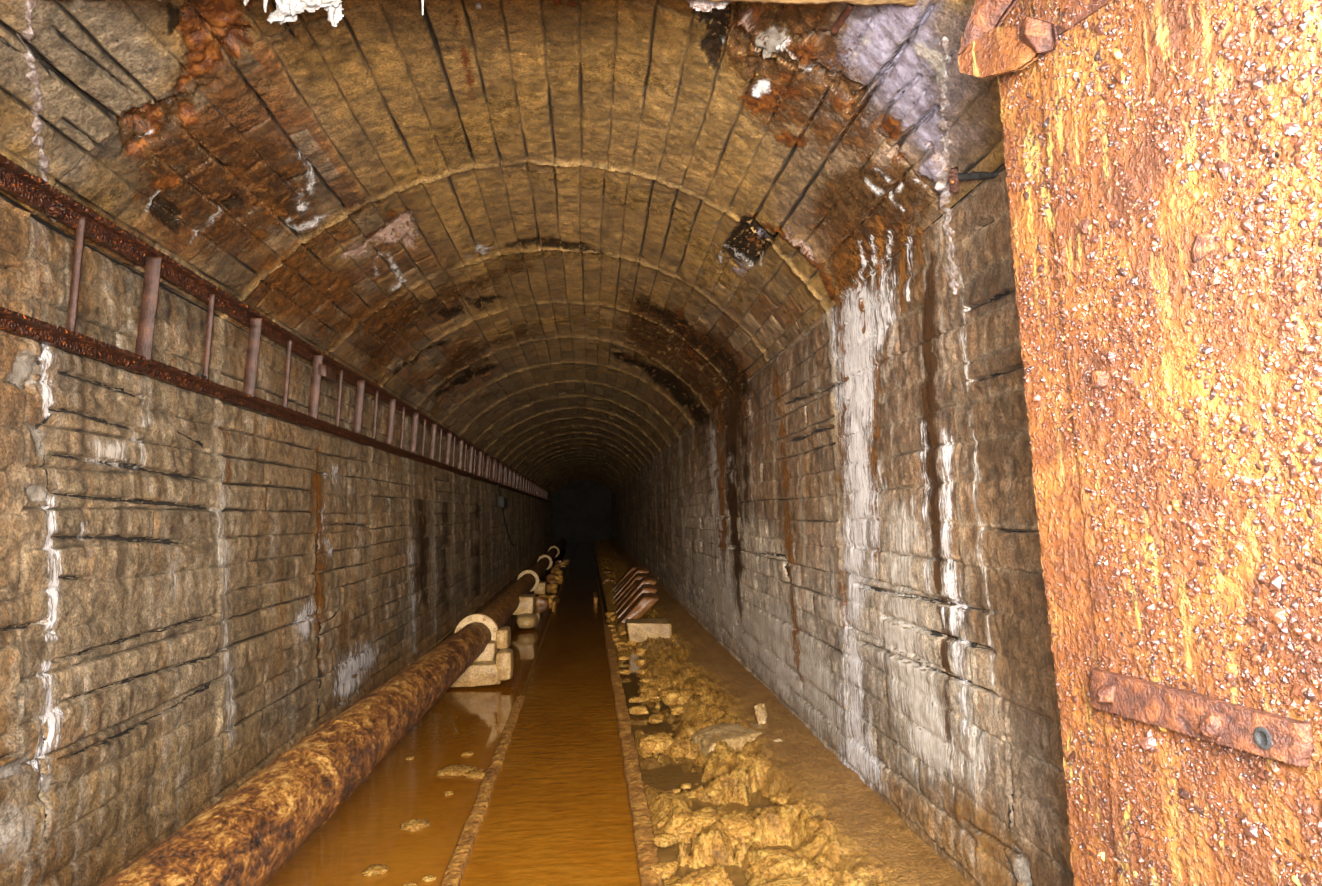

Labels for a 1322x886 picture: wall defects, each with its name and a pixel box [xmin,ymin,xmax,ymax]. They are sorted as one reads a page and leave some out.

spalling [116,0,253,156]
spalling [806,63,865,102]
rust [118,101,602,373]
leakage [39,495,63,641]
leakage [87,398,151,468]
rust [308,445,348,673]
leakage [609,163,990,807]